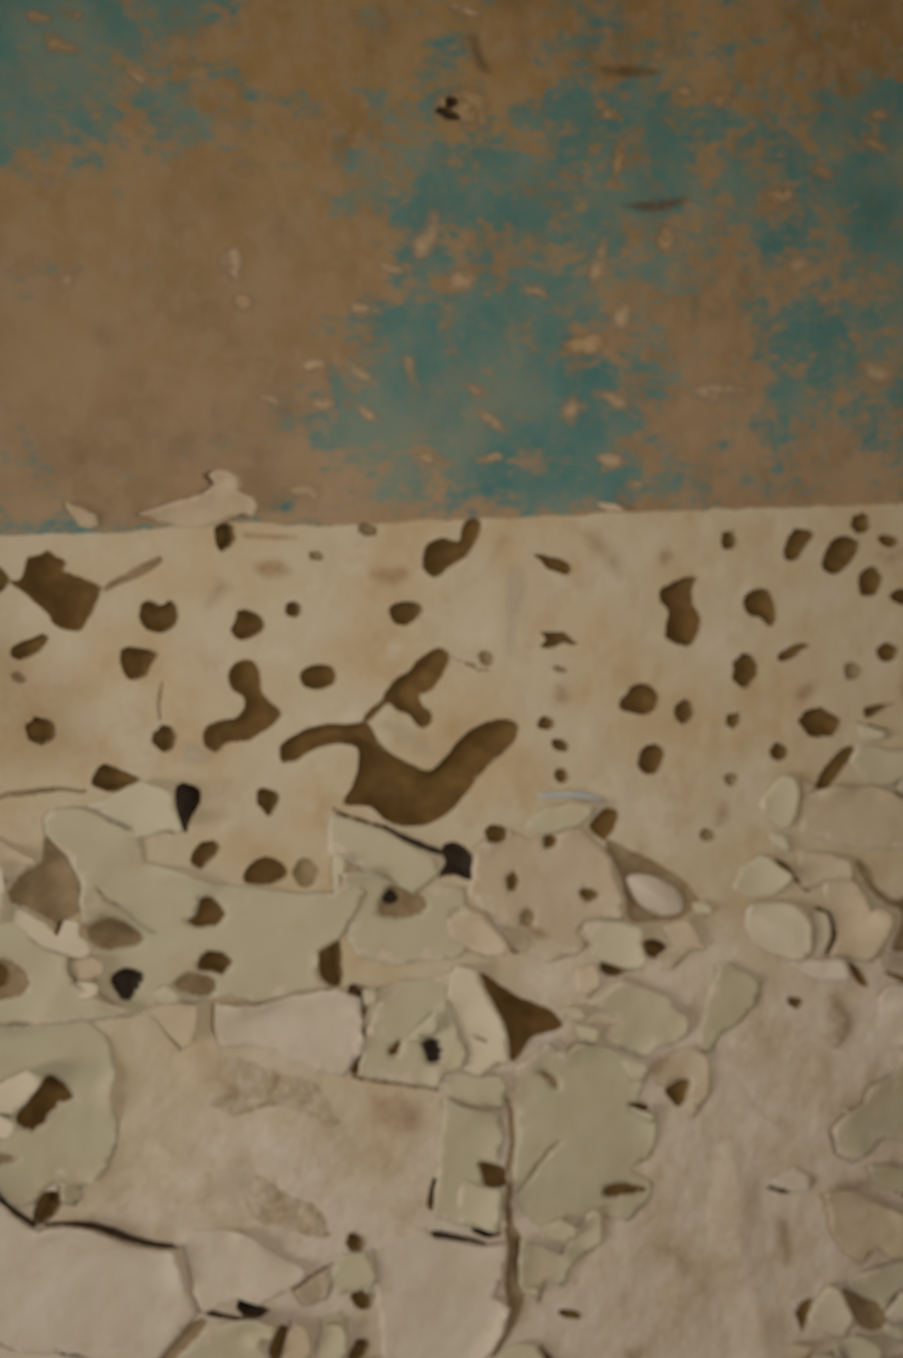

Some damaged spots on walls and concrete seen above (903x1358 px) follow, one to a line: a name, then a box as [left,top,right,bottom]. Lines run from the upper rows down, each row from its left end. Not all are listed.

spalling [422,517,481,578]
spalling [821,513,903,606]
spalling [0,550,163,683]
spalling [659,576,701,647]
crack [0,787,131,830]
crack [332,808,443,855]
peeling [733,703,903,988]
peeling [0,646,715,1304]
crack [0,1196,180,1249]
crack [431,1096,561,1357]
crack [762,1184,796,1193]
crack [161,1310,246,1358]